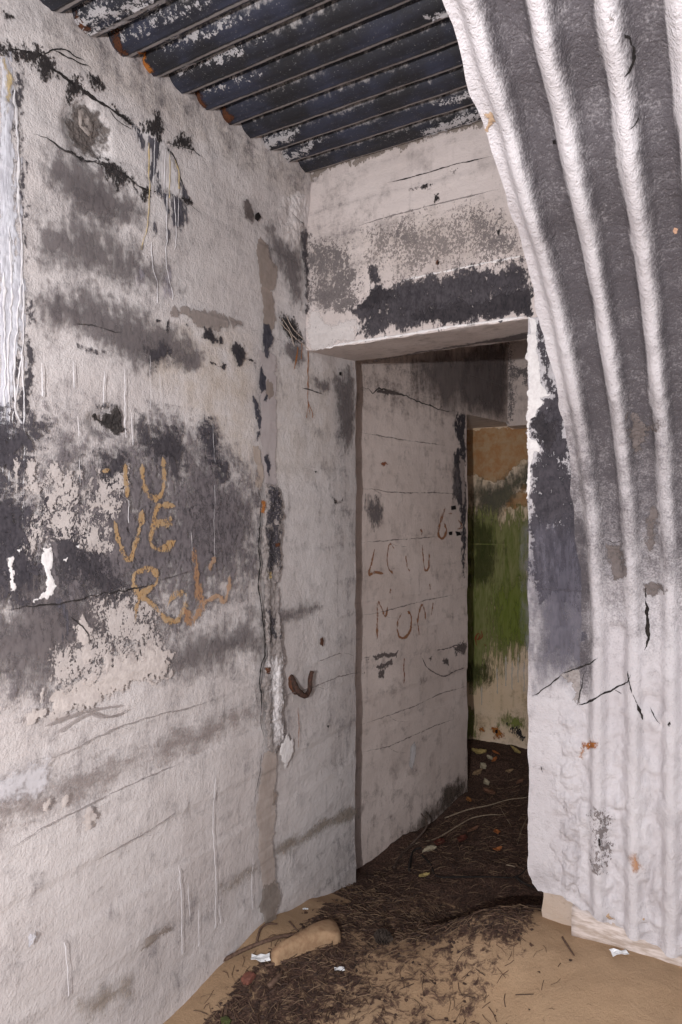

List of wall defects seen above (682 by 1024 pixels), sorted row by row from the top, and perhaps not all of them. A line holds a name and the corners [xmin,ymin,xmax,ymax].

peeling [74,0,266,76]
spalling [63,101,110,158]
crack [3,42,205,212]
peeling [262,124,322,164]
water stain [0,39,194,530]
water stain [256,237,309,366]
spalling [84,402,125,436]
peeling [7,457,130,603]
crack [9,571,188,636]
peeling [26,588,176,726]
crack [254,485,355,800]
crack [535,659,671,726]